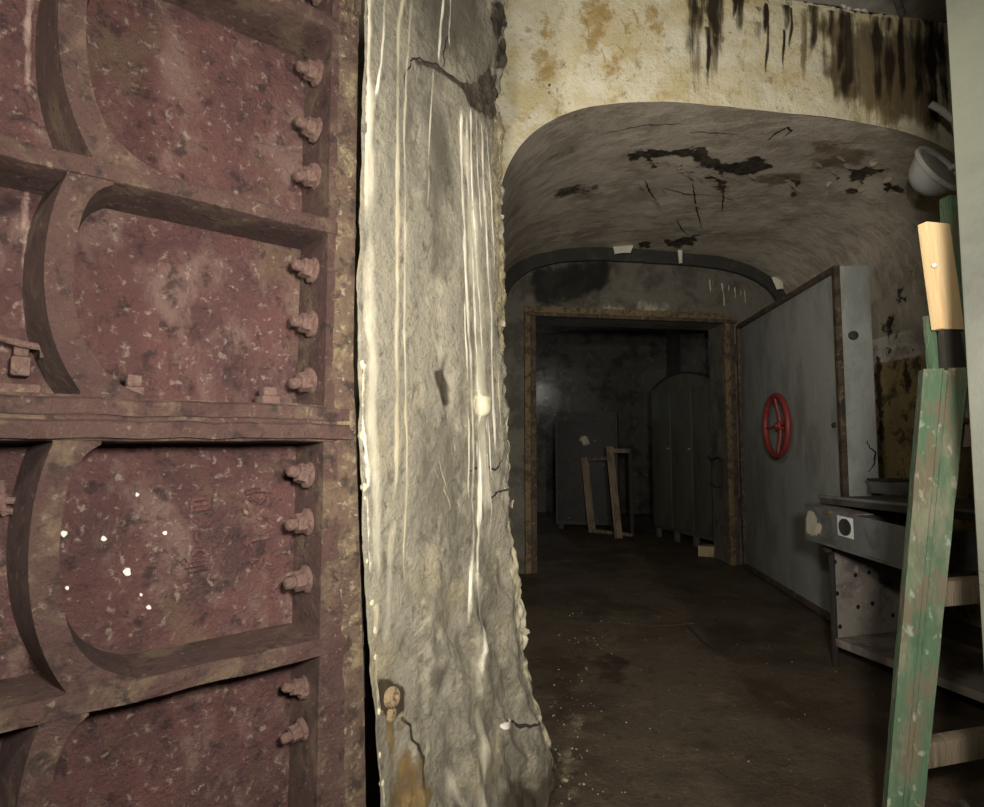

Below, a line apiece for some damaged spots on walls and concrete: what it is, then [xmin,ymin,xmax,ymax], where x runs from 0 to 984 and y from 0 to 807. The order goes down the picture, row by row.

damp [364,0,385,204]
damp [431,0,476,57]
damp [688,0,744,73]
damp [756,0,949,129]
damp [395,0,412,485]
peeling [613,245,633,254]
peeling [628,146,773,236]
peeling [785,156,904,197]
damp [360,257,380,568]
damp [460,110,501,671]
corrosion [378,679,432,807]
crack [401,716,427,806]